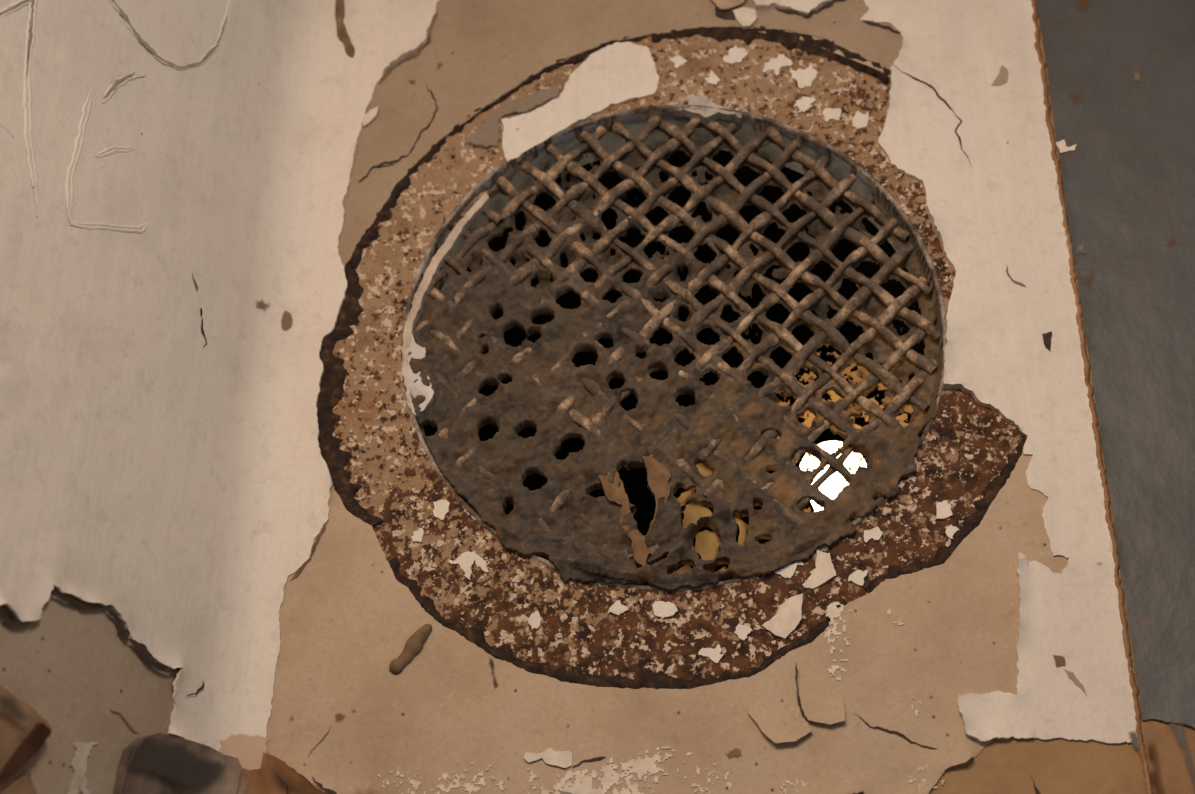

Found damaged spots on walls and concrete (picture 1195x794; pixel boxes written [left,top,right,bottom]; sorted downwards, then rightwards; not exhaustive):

crack [773,0,900,34]
crack [359,85,438,182]
peeling [338,0,903,267]
crack [894,65,972,167]
spalling [991,65,1008,86]
peeling [401,192,490,416]
rust [317,26,891,526]
spalling [1042,331,1052,352]
rust [864,425,1027,593]
peeling [0,444,1147,794]
crack [795,663,806,718]
crack [852,713,938,750]